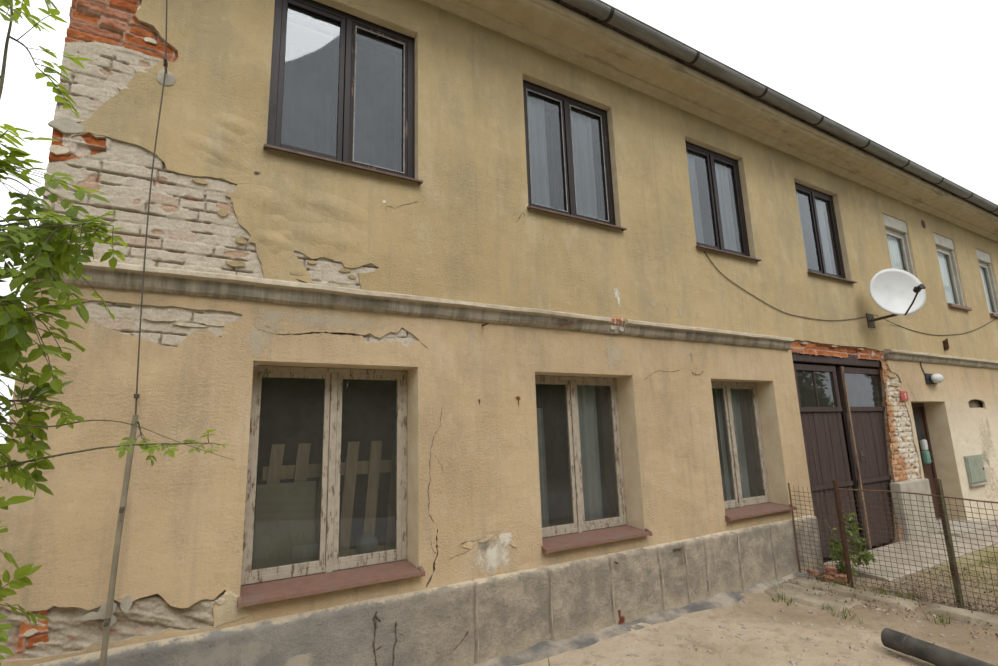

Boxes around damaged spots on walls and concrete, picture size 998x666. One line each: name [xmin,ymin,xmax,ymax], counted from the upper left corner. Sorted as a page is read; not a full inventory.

flaking render [39,0,264,278]
flaking render [290,251,377,289]
flaking render [790,340,921,482]
crack [428,412,479,569]
flaking render [0,590,227,660]
crack [372,611,405,666]